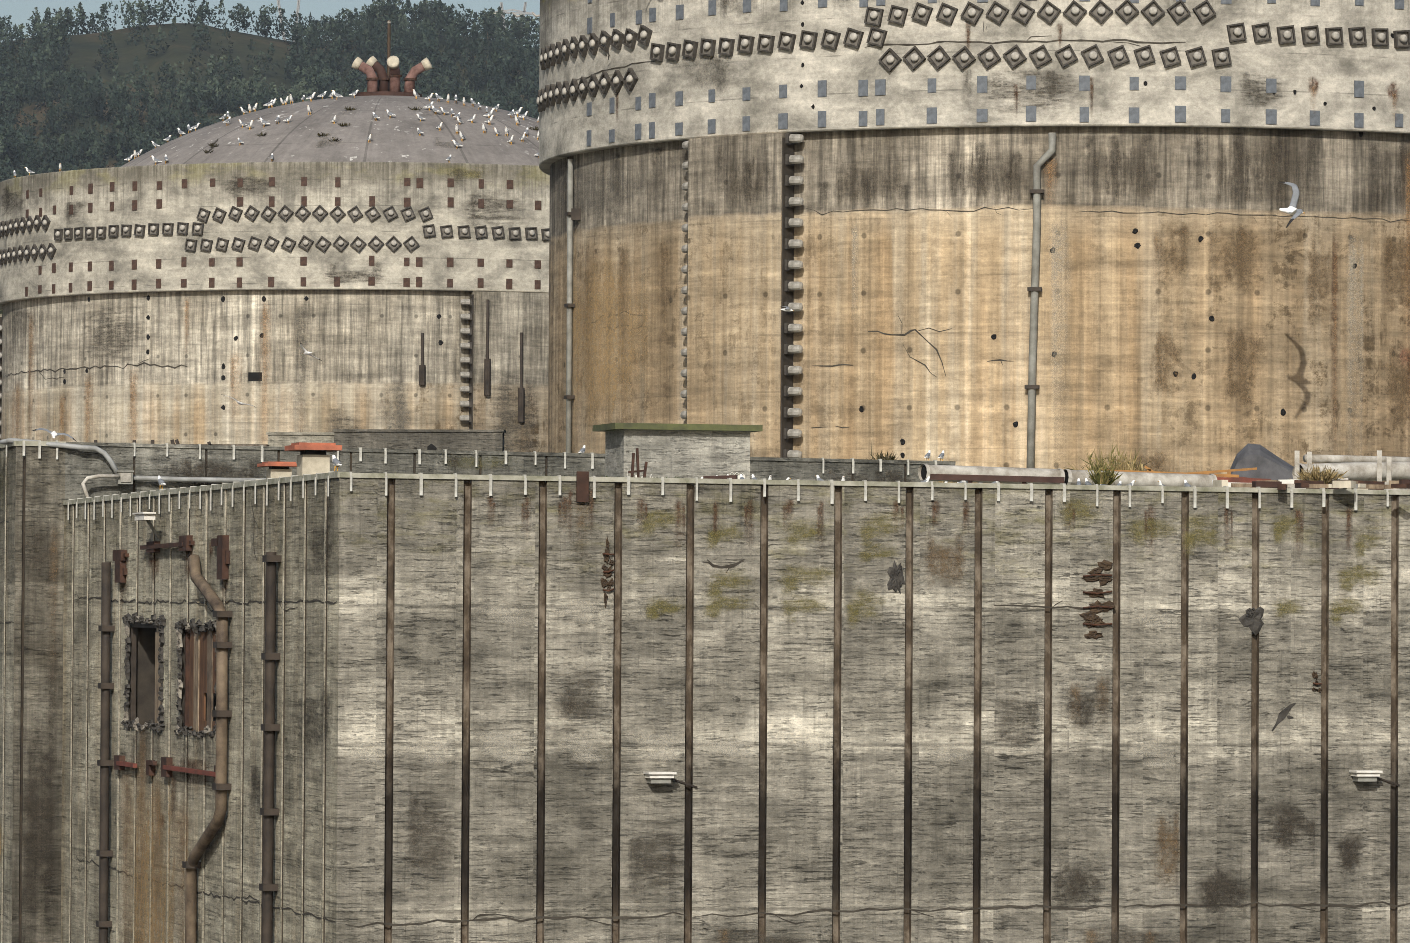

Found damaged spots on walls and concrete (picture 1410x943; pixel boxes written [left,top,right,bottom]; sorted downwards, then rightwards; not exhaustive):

leakage [949,148,1021,195]
leakage [1086,136,1155,196]
leakage [1217,138,1295,200]
crack [7,359,187,380]
leakage [88,310,137,357]
crack [812,361,850,369]
crack [868,316,952,377]